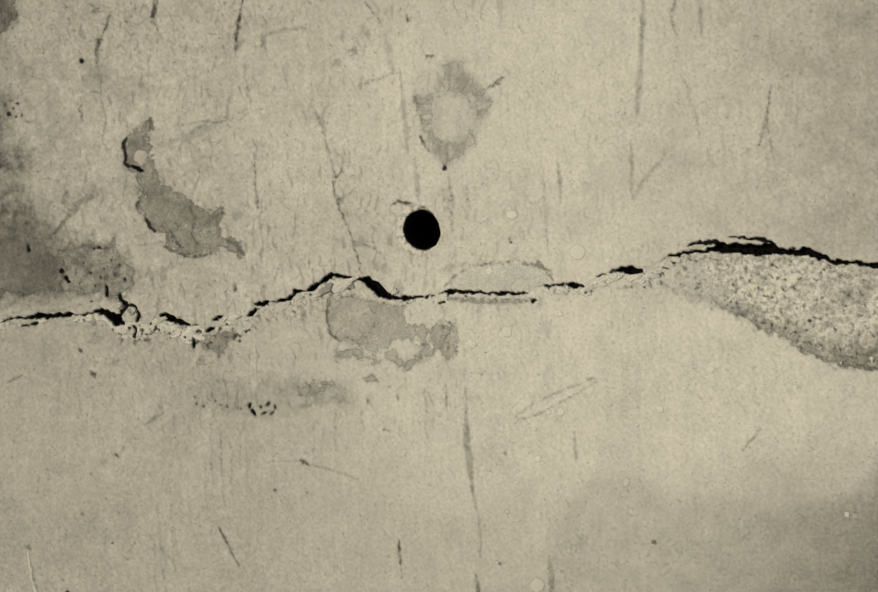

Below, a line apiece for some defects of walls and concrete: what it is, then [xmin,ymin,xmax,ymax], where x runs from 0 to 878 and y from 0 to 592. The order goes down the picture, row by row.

peeling [0,0,18,33]
leakage [0,186,34,243]
peeling [121,118,245,259]
crack [0,170,878,347]
spalling [689,254,878,371]